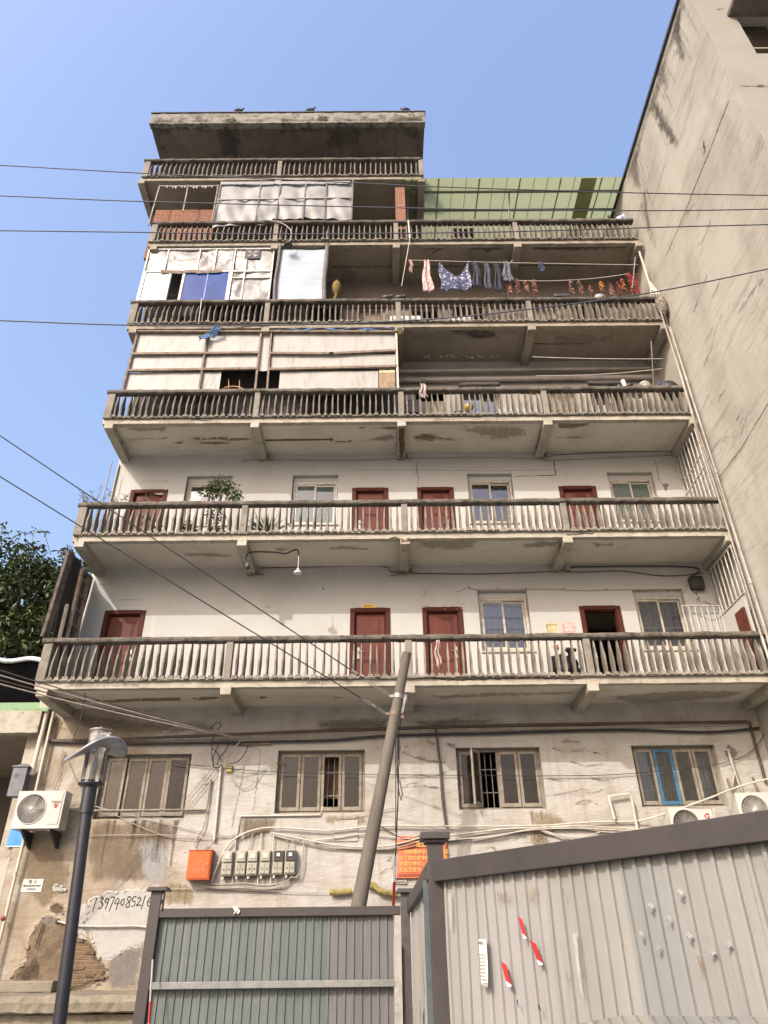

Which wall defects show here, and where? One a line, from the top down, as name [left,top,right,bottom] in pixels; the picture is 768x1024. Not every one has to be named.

water stain [280,118,419,158]
crack [551,740,614,805]
water stain [90,820,178,880]
spalling [7,883,67,981]